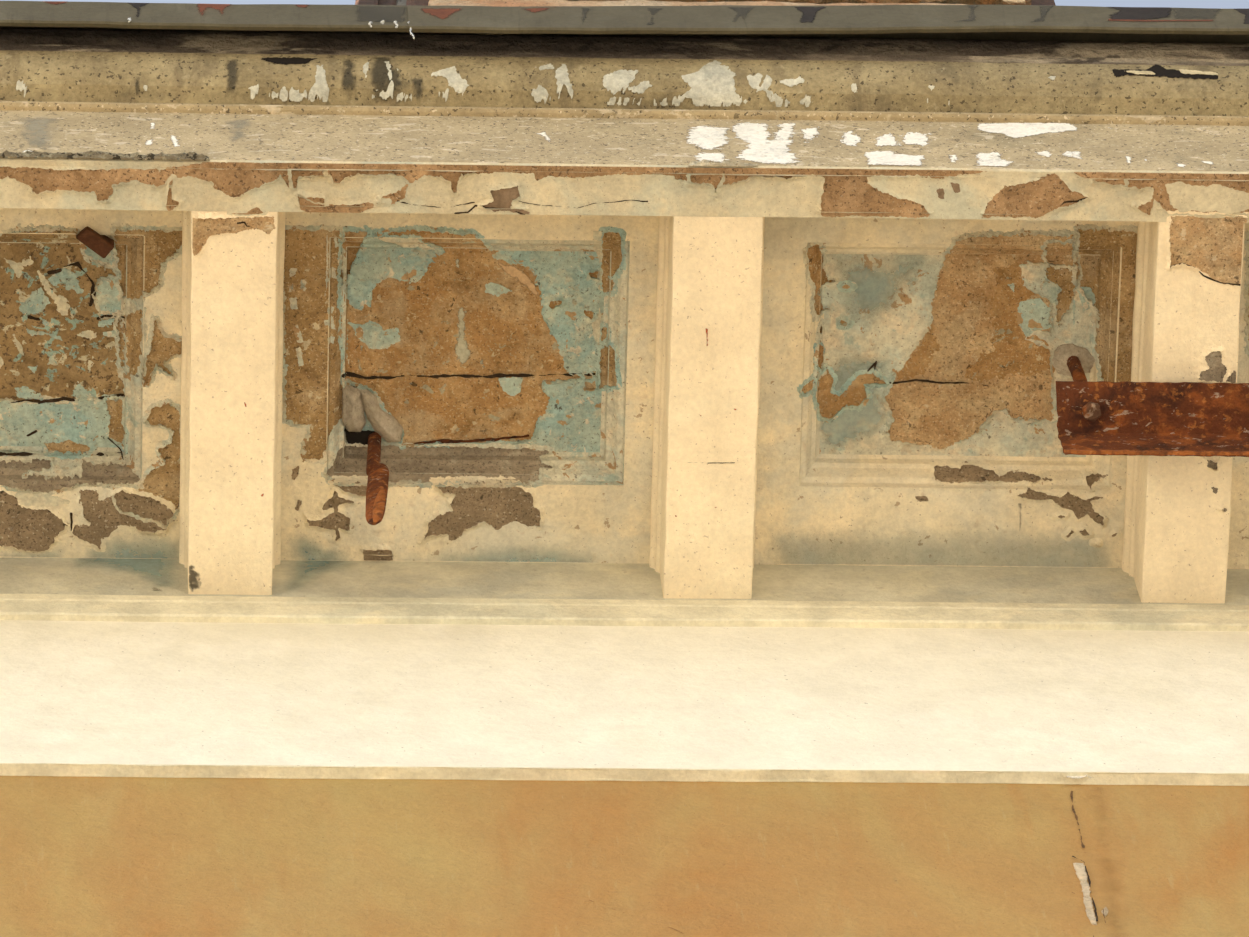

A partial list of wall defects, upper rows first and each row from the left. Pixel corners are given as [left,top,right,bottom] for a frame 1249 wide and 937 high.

peeling [249,57,329,102]
peeling [372,61,412,101]
peeling [431,66,469,102]
peeling [531,63,573,103]
peeling [603,60,813,107]
spalling [1112,64,1218,79]
peeling [0,122,1249,561]
crack [342,371,595,380]
crack [414,434,529,445]
crack [1070,791,1109,937]